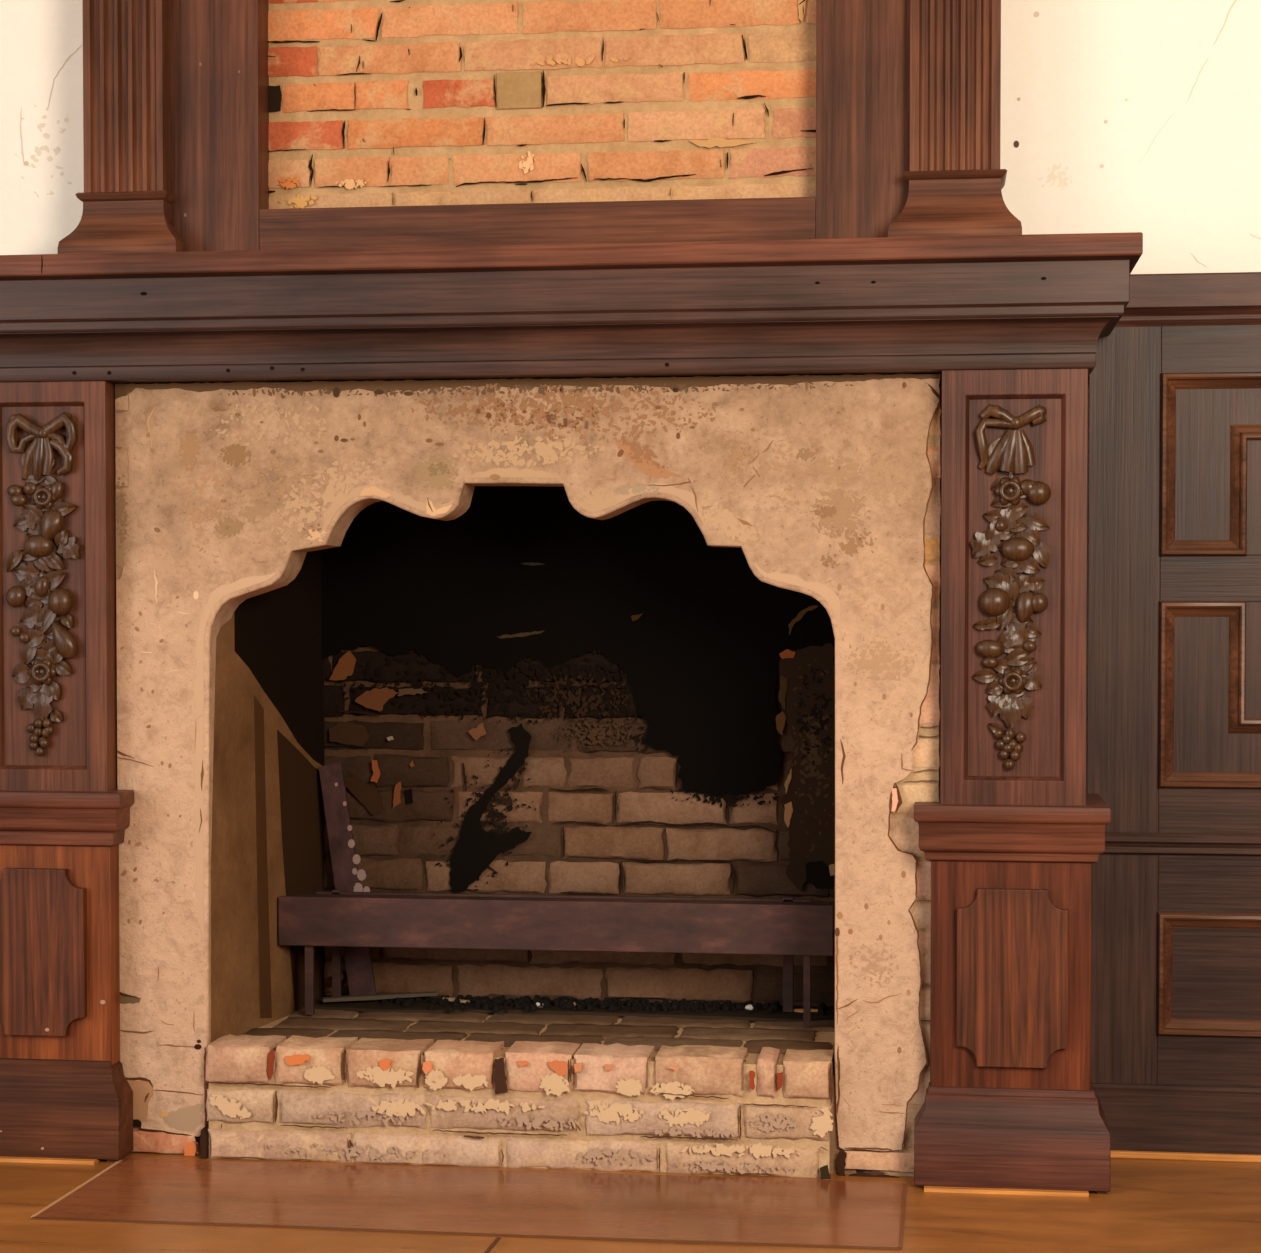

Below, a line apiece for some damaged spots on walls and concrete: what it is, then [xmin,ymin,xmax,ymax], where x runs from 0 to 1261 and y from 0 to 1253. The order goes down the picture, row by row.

crack [1139,0,1237,163]
flaking render [910,402,941,724]
spalling [329,651,356,681]
spalling [355,687,428,712]
spalling [370,760,381,783]
spalling [784,763,793,827]
flaking render [912,739,940,767]
peeling [347,825,370,892]
flaking render [845,784,939,1172]
spalling [267,1050,311,1079]
spalling [547,1060,583,1076]
flaking render [127,1080,200,1156]